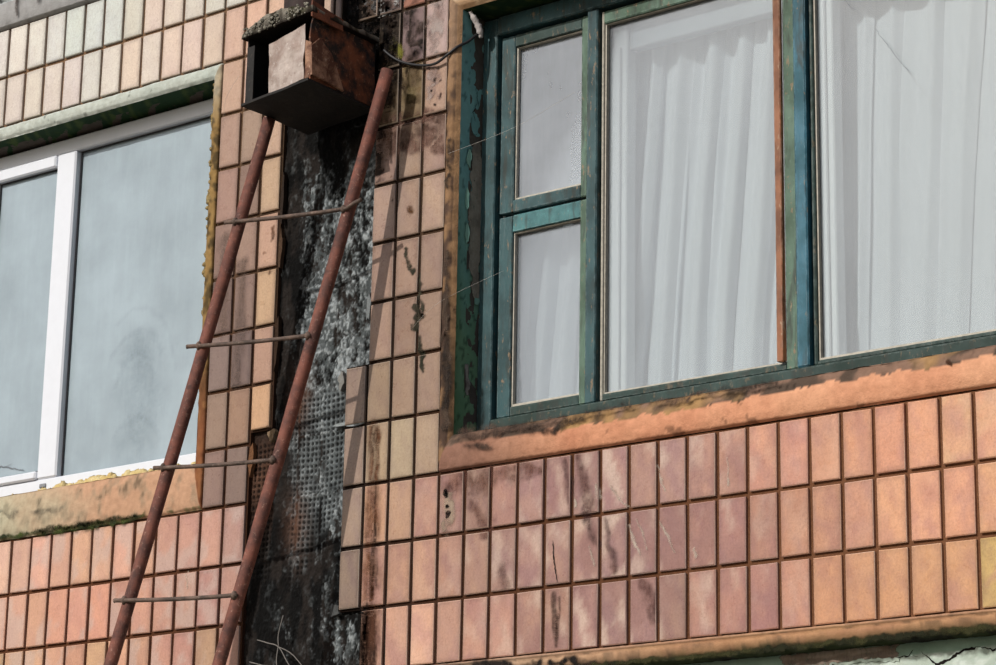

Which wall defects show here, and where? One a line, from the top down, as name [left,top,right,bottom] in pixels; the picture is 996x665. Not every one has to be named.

leakage [349,0,451,188]
peeling [465,141,482,305]
leakage [440,250,632,450]
leakage [565,454,616,573]
leakage [359,605,377,665]
leakage [552,593,560,646]
leakage [526,655,595,665]
crack [898,647,996,665]